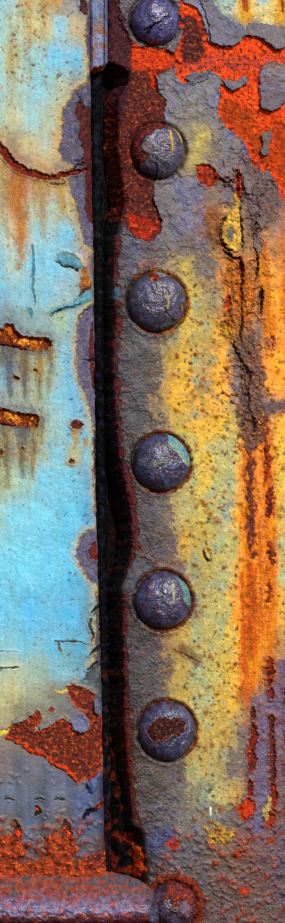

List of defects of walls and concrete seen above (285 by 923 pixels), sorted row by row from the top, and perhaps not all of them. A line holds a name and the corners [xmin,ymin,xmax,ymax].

peeling [58,0,93,250]
peeling [103,0,285,242]
corrosion [109,235,194,575]
crack [223,213,264,367]
peeling [0,303,103,784]
corrosion [237,400,285,707]
corrosion [117,594,199,828]
corrosion [0,823,106,879]
corrosion [131,843,147,877]
corrosion [149,871,207,923]